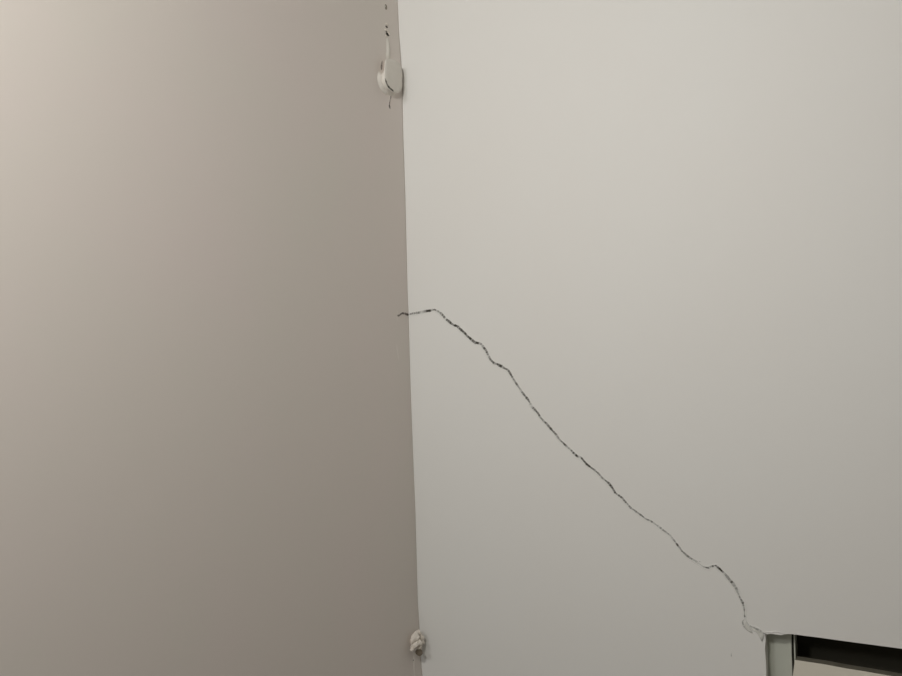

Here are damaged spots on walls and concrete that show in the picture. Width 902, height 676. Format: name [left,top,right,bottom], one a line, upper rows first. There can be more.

crack [397,308,765,635]